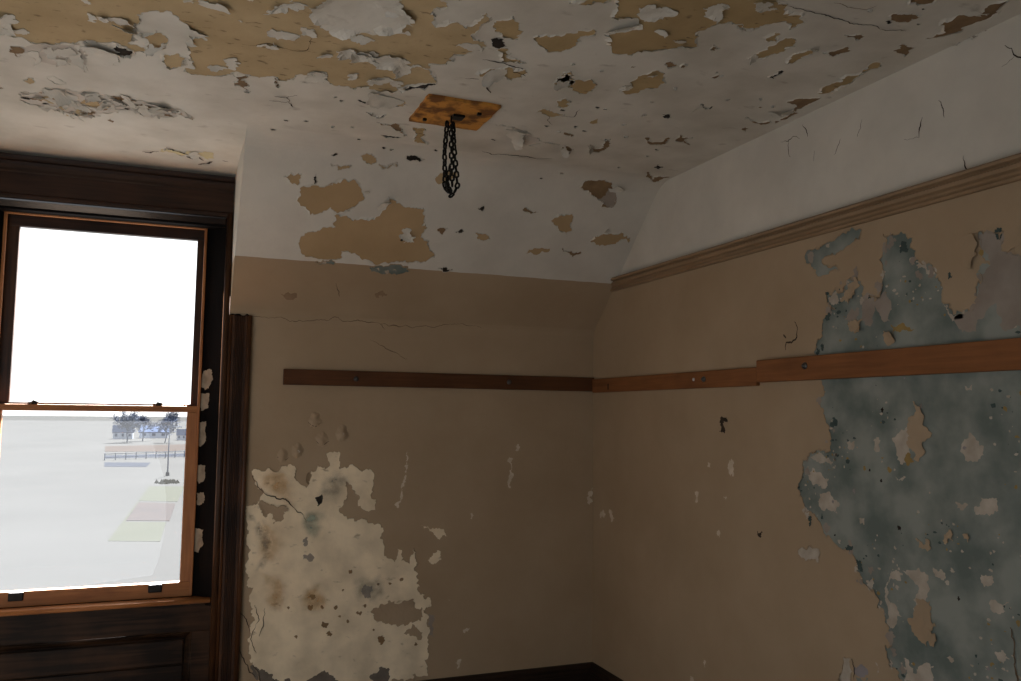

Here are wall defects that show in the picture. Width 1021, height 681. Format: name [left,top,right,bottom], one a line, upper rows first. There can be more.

peeling [886,0,1009,57]
peeling [0,0,883,275]
peeling [804,222,1021,355]
peeling [198,369,213,447]
peeling [194,528,203,552]
peeling [197,465,205,505]
flaking render [240,451,446,681]
peeling [797,370,1021,681]